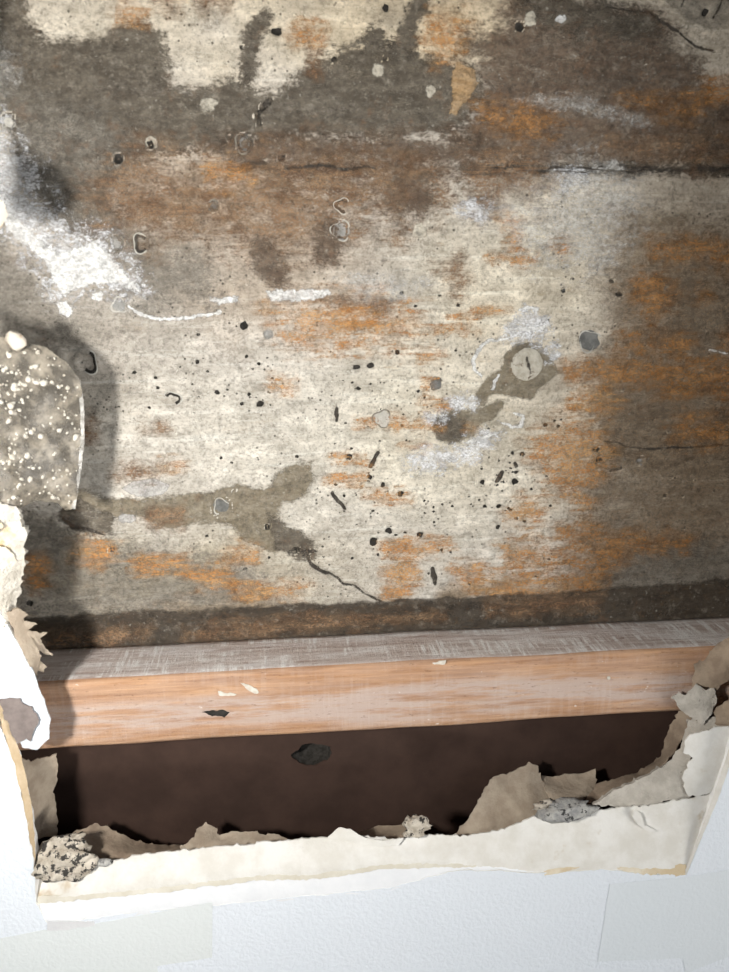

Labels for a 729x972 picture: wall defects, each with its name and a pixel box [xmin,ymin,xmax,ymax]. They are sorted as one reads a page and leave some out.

crack [606,6,715,53]
water stain [0,0,729,348]
corrosion [435,250,471,299]
water stain [401,304,561,477]
corrosion [110,462,188,485]
corrosion [323,453,408,506]
corrosion [446,405,697,596]
corrosion [23,555,53,596]
corrosion [128,545,307,604]
crack [288,547,382,602]
water stain [16,460,729,650]
corrosion [379,534,452,602]